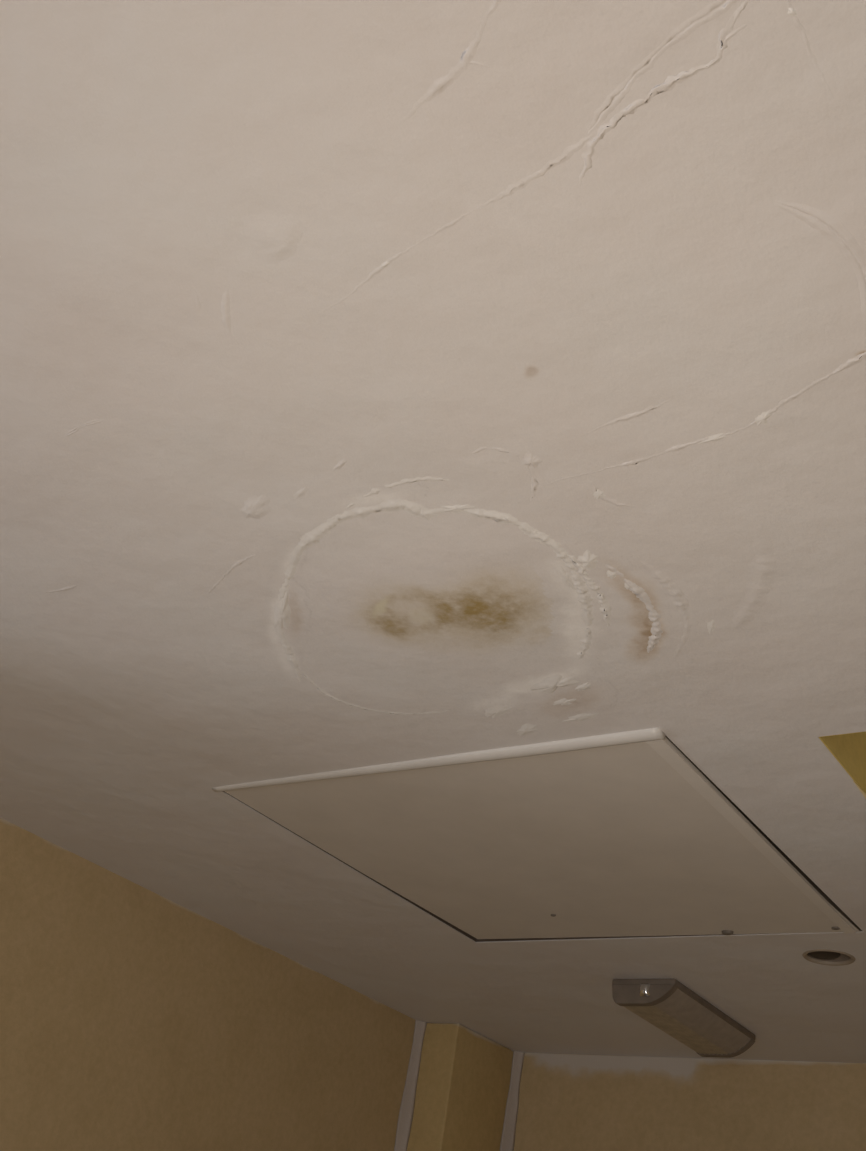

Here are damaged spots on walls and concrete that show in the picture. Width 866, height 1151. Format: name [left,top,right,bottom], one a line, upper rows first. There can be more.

leakage [331,549,556,663]